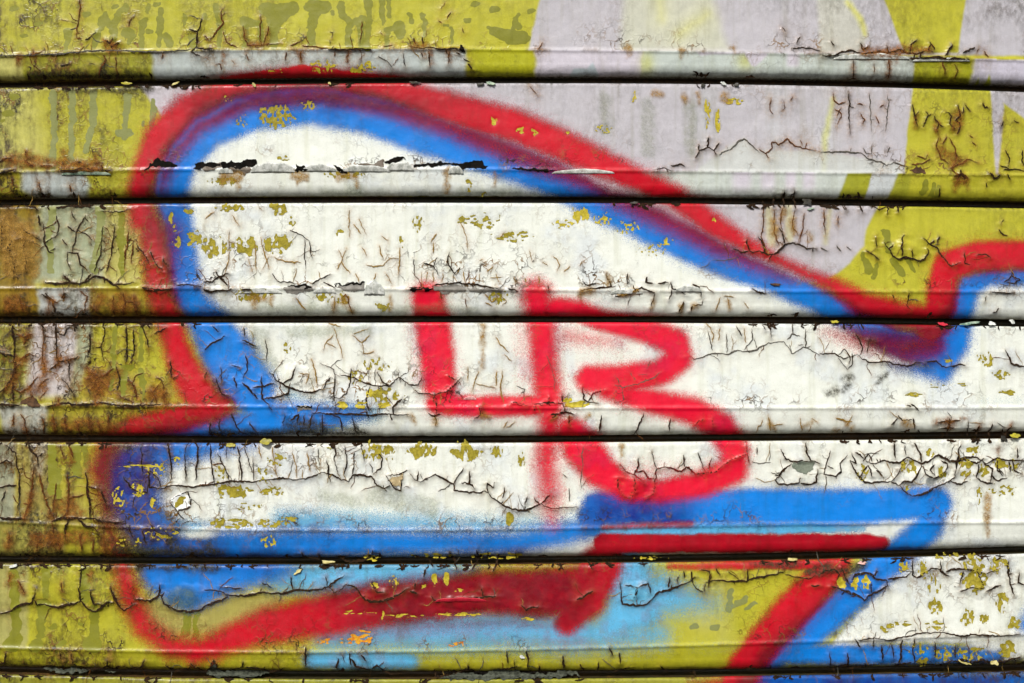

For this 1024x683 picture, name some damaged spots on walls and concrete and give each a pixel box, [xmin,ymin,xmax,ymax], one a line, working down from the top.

corrosion [861,46,930,70]
crack [658,27,1024,196]
spalling [144,157,177,171]
peeling [194,155,487,197]
corrosion [0,210,41,278]
peeling [168,203,296,259]
peeling [553,207,639,234]
corrosion [5,351,70,397]
crack [0,150,1024,618]
peeling [837,561,871,590]
peeling [899,552,1009,631]
peeling [909,592,1021,667]